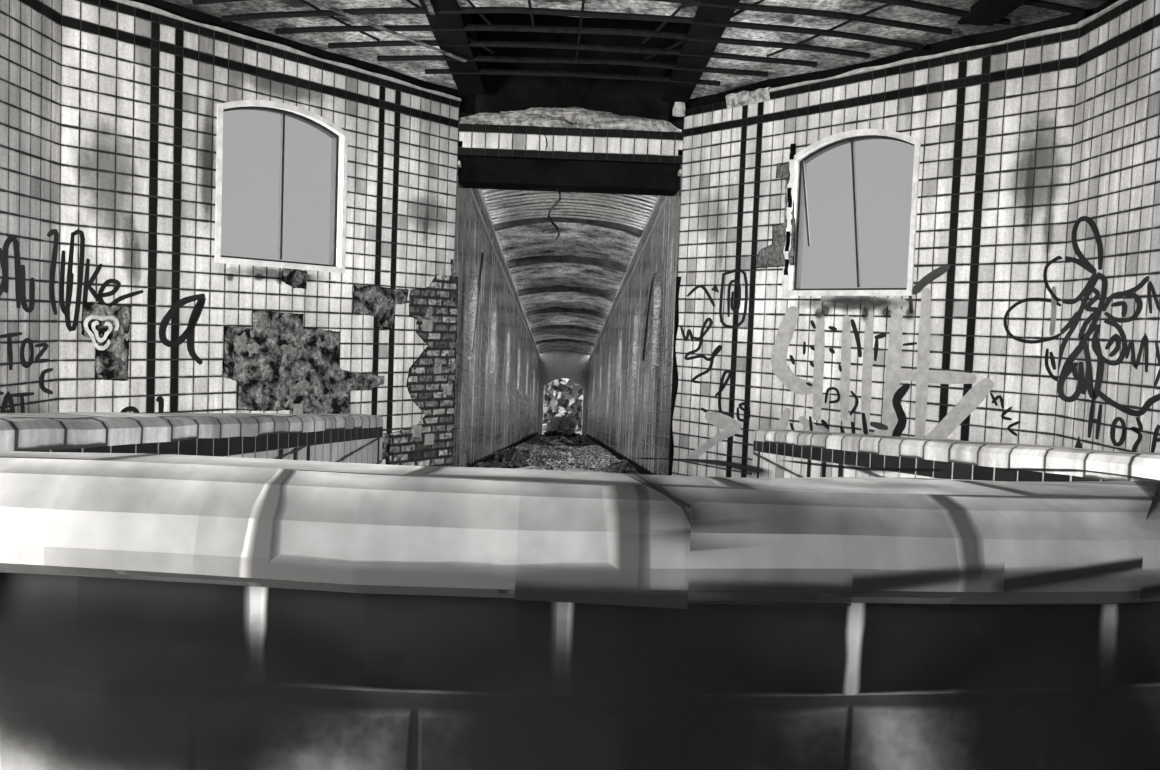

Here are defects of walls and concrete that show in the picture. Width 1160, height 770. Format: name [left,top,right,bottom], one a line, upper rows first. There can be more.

peeling [282,268,307,289]
peeling [222,310,384,414]
peeling [352,259,458,467]